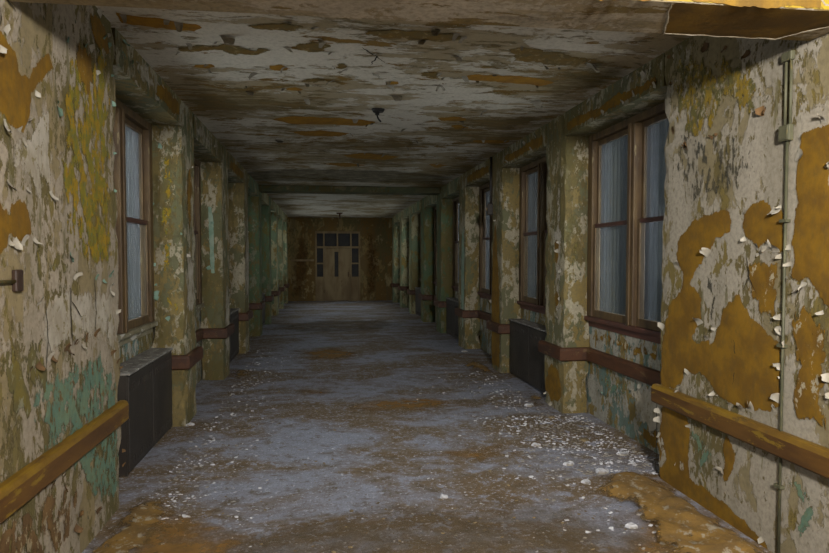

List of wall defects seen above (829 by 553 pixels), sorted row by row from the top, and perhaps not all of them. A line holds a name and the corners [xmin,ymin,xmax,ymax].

peeling [116,12,202,32]
peeling [175,36,270,55]
peeling [246,21,320,32]
peeling [283,39,335,55]
peeling [366,29,467,45]
peeling [508,46,600,73]
peeling [460,74,554,88]
peeling [273,116,375,137]
peeling [0,8,123,451]
peeling [595,112,829,430]
peeling [630,382,768,549]
peeling [0,428,126,553]